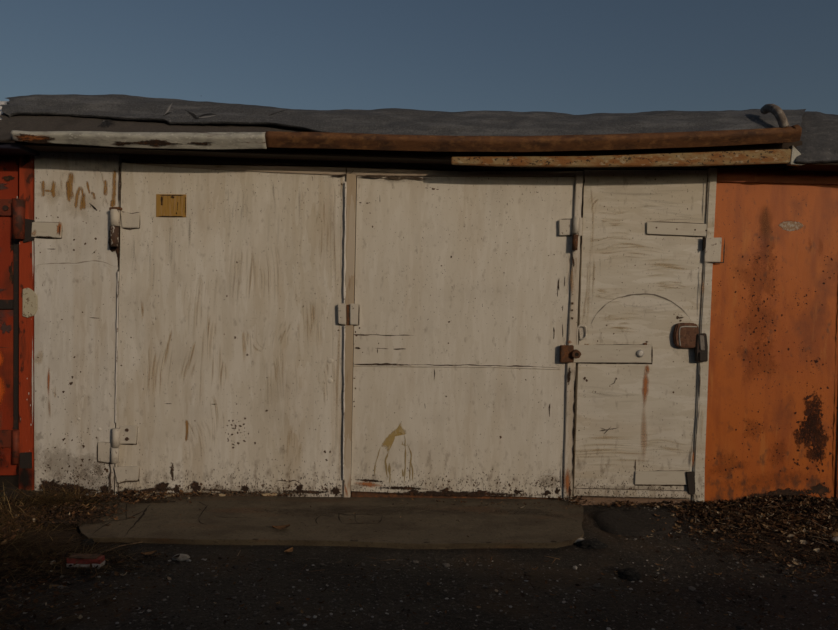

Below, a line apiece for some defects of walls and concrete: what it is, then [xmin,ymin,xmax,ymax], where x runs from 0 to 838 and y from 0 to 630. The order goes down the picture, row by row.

rust [729,237,832,480]
rust [118,479,347,498]
rust [357,467,571,499]